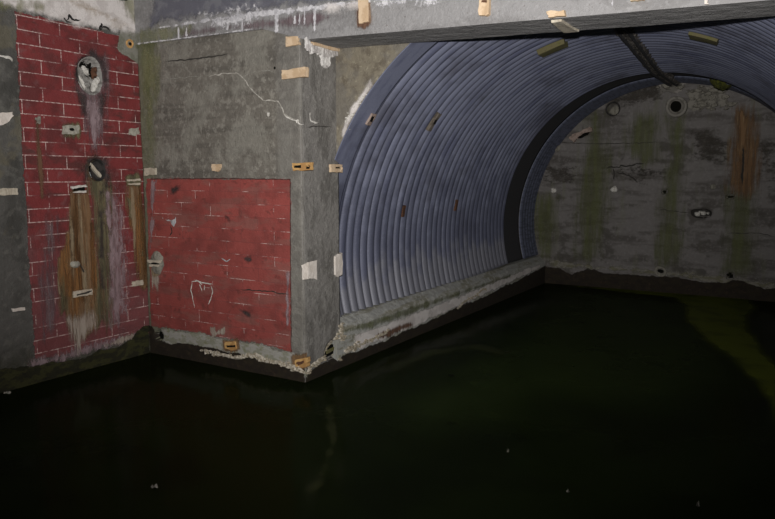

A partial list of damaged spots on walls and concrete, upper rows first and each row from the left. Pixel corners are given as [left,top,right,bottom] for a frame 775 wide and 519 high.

damp [138,0,437,45]
damp [75,51,109,147]
crack [150,54,329,128]
rust [57,190,104,354]
rust [125,185,148,290]
peeling [200,322,390,374]